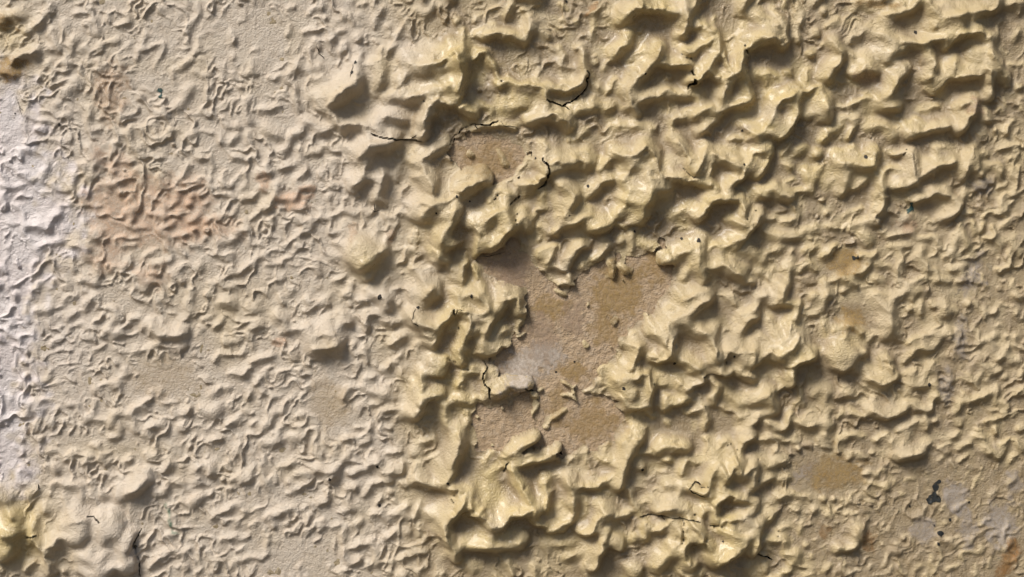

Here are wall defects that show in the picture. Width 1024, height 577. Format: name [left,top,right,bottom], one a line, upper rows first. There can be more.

peeling [447,126,532,189]
crack [552,81,588,110]
peeling [463,238,673,458]
peeling [788,444,1024,577]